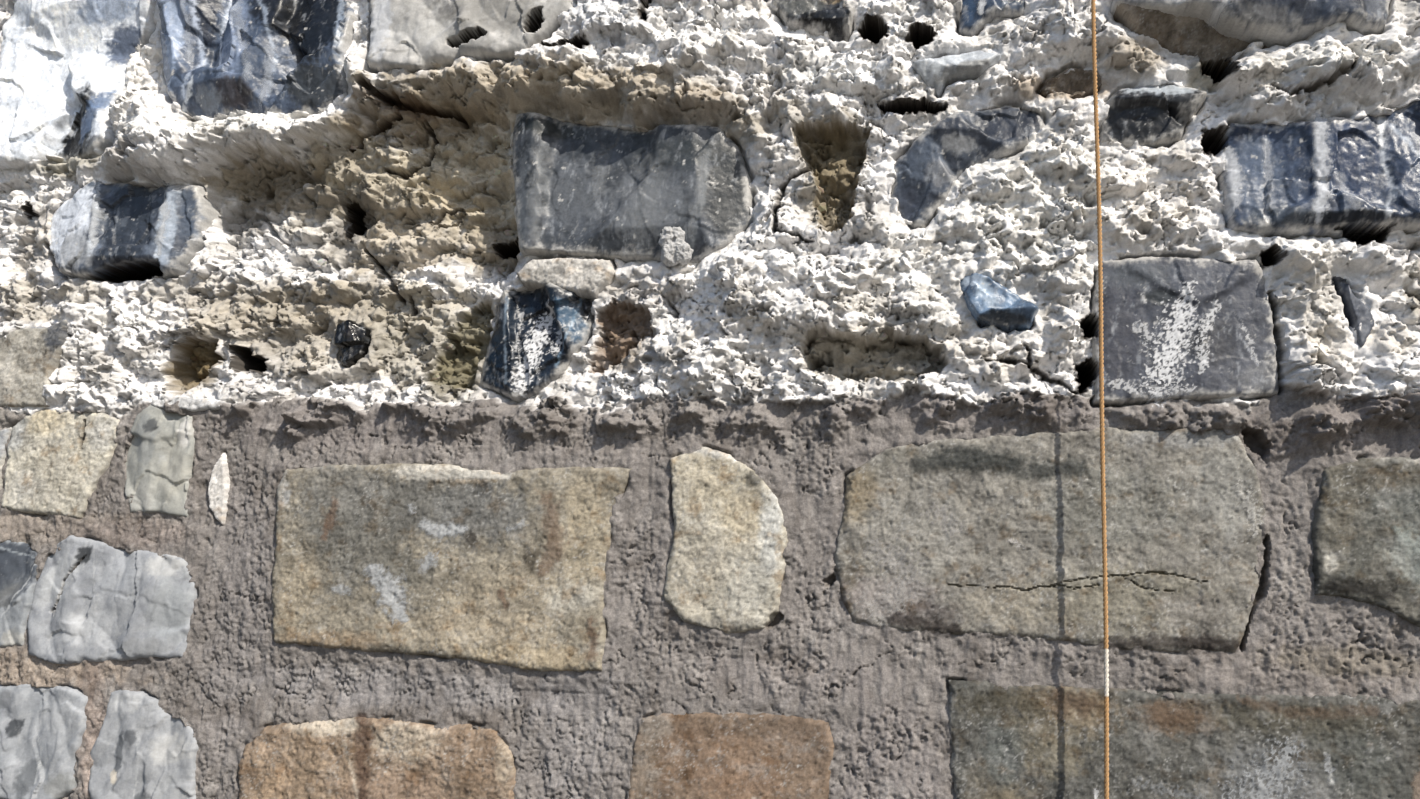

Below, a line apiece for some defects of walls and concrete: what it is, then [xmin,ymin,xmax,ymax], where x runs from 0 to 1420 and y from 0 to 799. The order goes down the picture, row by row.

crack [340,0,470,180]
crack [947,570,1208,594]